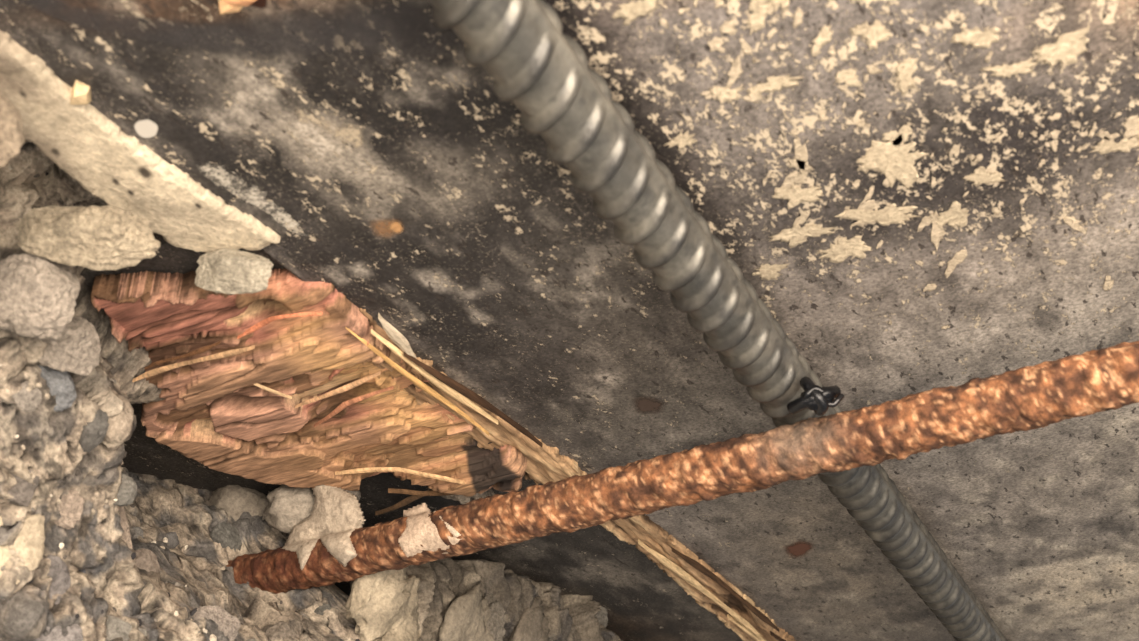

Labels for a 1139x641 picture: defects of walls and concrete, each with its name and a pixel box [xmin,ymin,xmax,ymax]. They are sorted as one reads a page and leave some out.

water stain [20,0,405,55]
peeling [612,0,698,26]
water stain [298,110,362,147]
peeling [664,130,697,149]
peeling [700,0,1090,266]
peeling [1012,92,1139,204]
peeling [752,263,791,281]
peeling [923,250,967,292]
spalling [0,93,360,641]
corrosion [635,398,663,413]
corrosion [786,542,812,557]
spalling [405,558,624,641]